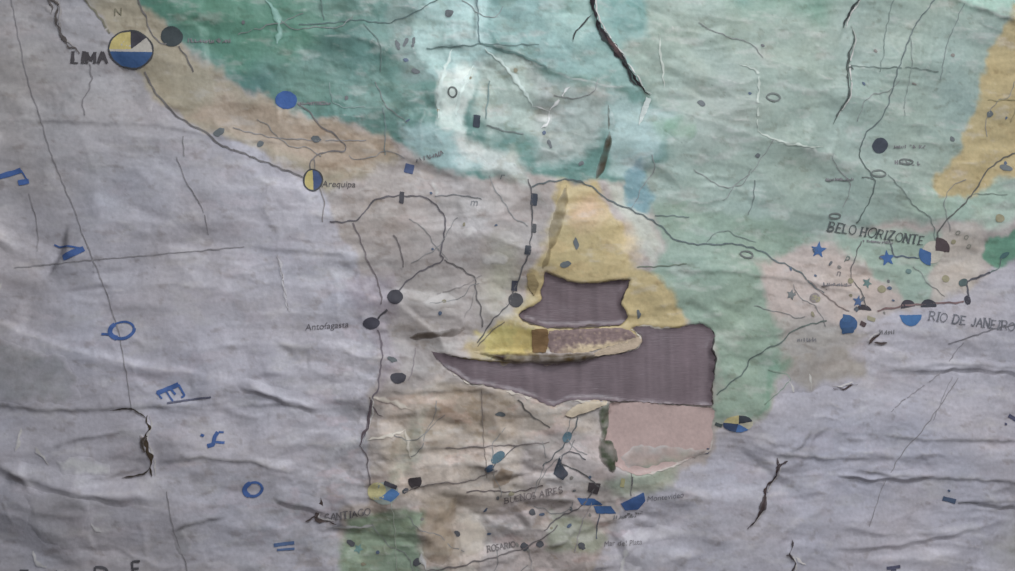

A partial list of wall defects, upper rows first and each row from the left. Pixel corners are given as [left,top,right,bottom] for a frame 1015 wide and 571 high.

peeling [422,292,457,311]
peeling [433,272,717,475]